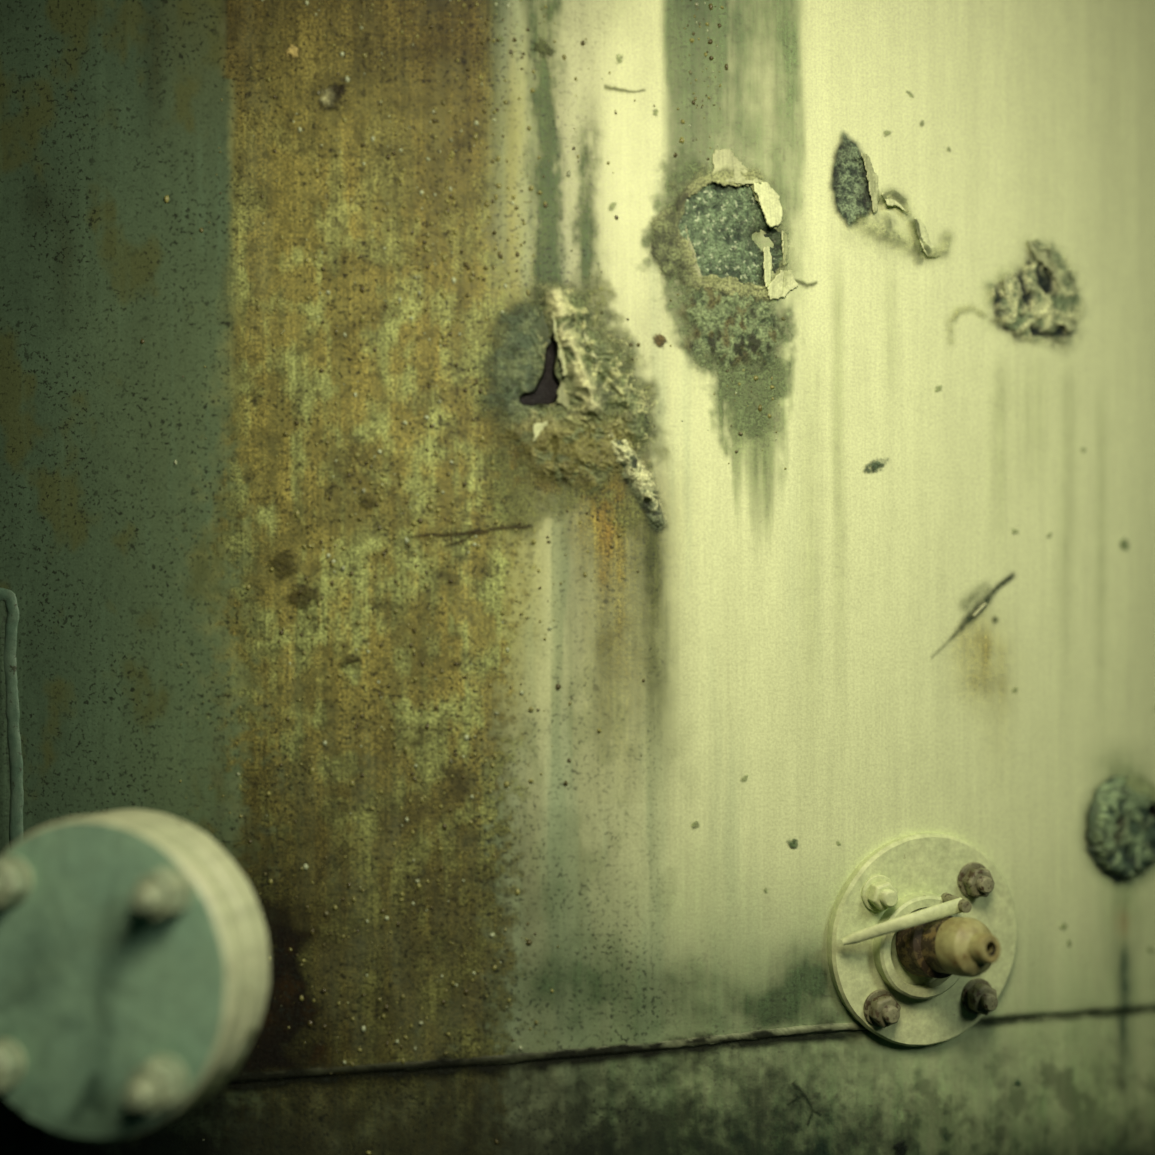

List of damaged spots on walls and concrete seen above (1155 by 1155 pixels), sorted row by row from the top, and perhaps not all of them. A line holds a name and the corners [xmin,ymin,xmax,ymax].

damp [665,0,798,188]
peeling [832,133,940,259]
peeling [643,149,798,436]
damp [719,359,785,482]
rust [221,0,871,1120]
damp [643,519,661,615]
damp [743,959,828,1026]
rust [976,1007,1155,1025]